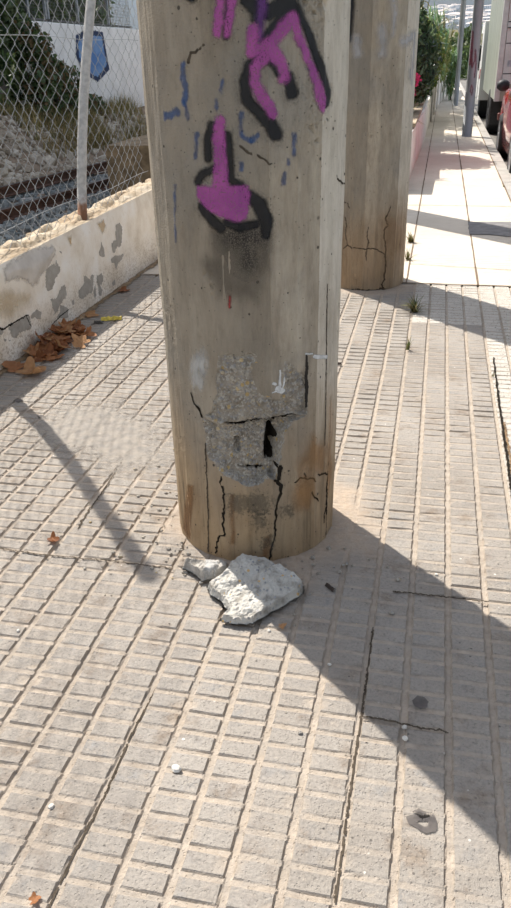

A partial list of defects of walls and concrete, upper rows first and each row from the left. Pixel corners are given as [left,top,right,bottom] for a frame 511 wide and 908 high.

peeling [99,223,124,269]
peeling [45,251,116,318]
peeling [0,310,41,341]
crack [0,309,69,330]
crack [269,178,391,560]
spalling [201,352,309,487]
crack [204,443,226,554]